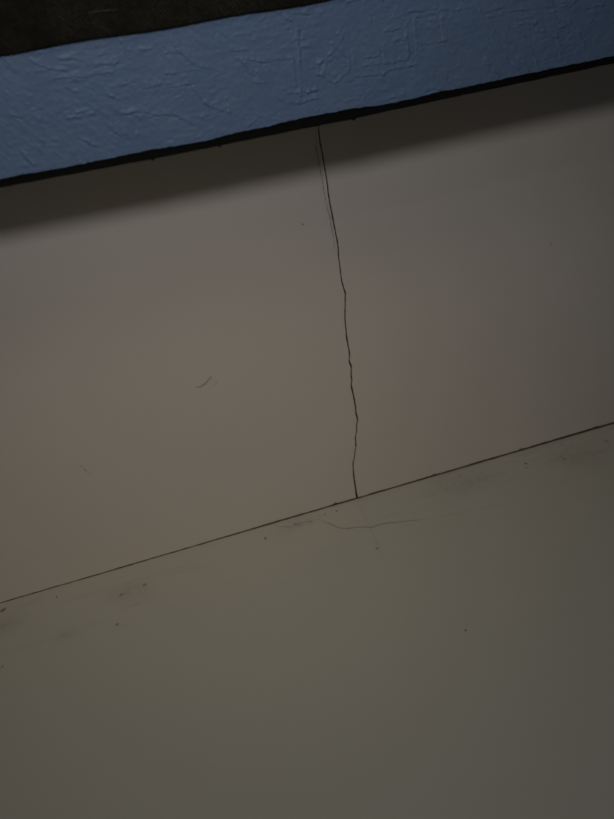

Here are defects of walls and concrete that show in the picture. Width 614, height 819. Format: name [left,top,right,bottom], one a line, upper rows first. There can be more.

crack [1,128,614,603]